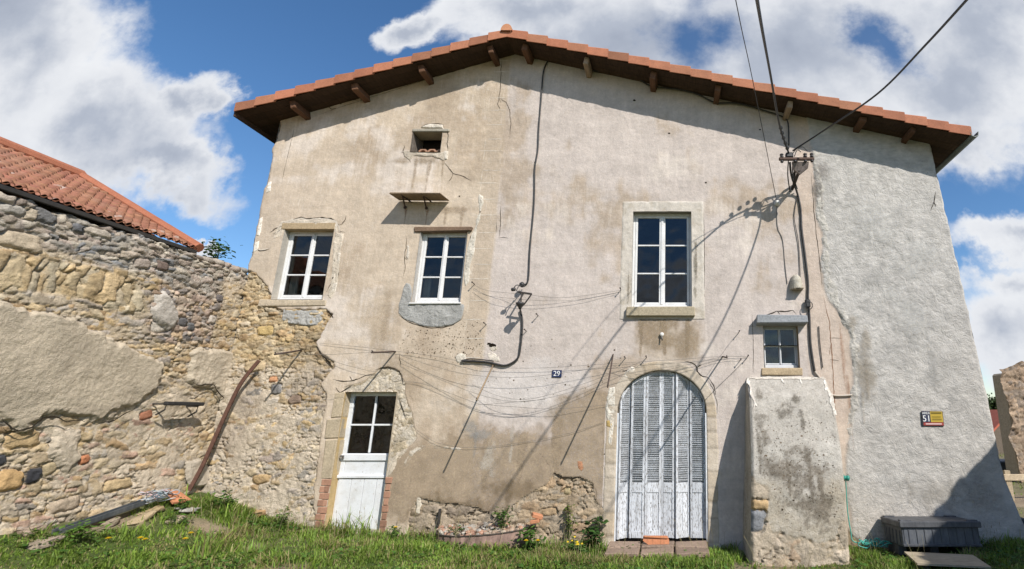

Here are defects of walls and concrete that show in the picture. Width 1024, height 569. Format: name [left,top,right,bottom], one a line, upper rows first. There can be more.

peeling [0,301,164,434]
spalling [186,217,344,528]
peeling [344,368,461,477]
spalling [408,461,605,544]
leakage [766,456,831,524]